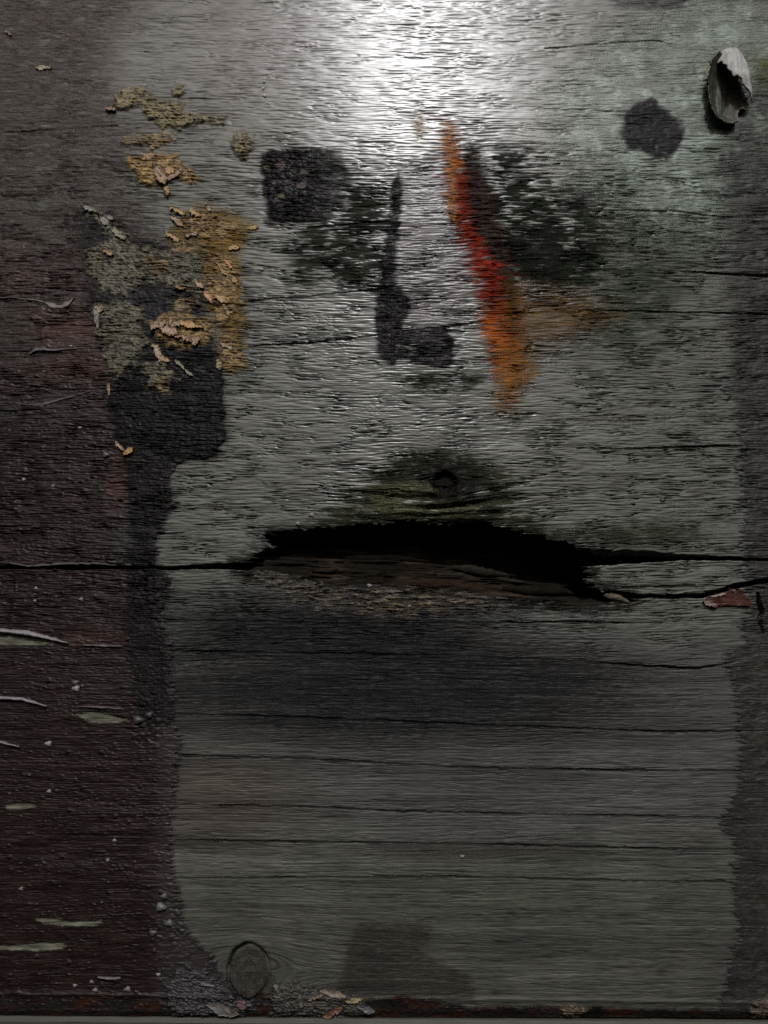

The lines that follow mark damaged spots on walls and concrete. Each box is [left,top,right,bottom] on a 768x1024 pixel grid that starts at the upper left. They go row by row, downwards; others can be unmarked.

damp [374,172,410,365]
rust [439,122,611,399]
peeling [0,0,247,1017]
crack [156,563,240,571]
crack [165,616,280,624]
crack [378,554,745,624]
peeling [703,87,768,1014]